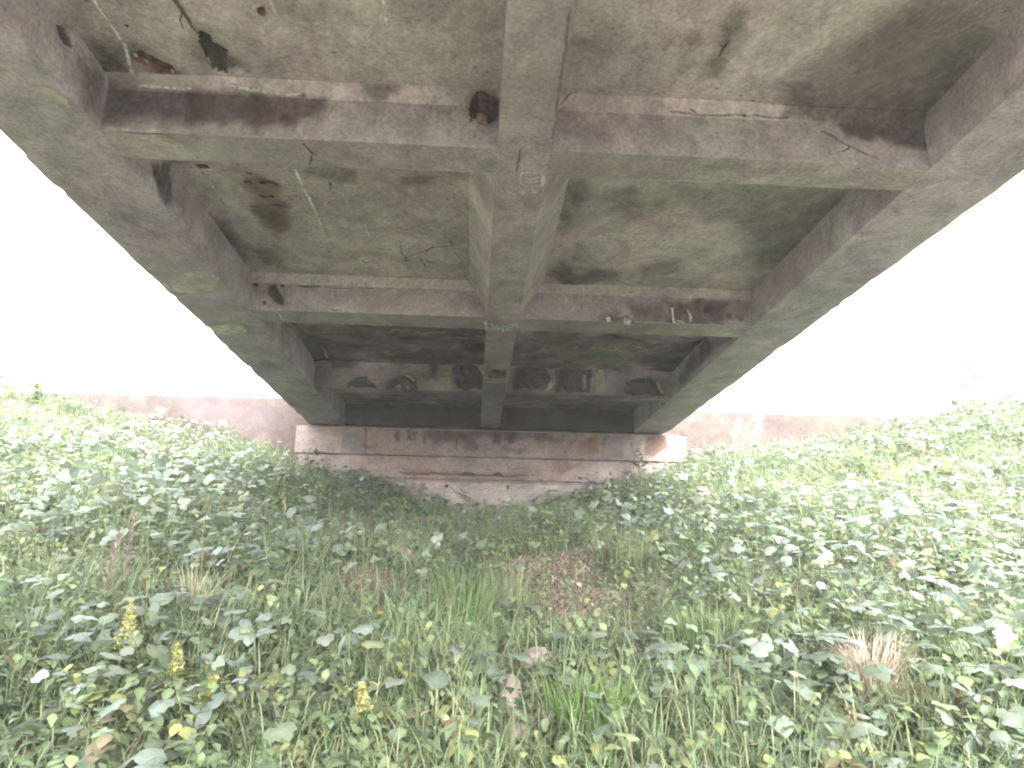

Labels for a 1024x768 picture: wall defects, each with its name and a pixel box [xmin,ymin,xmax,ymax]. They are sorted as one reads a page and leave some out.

spalling [51,14,79,57]
crack [172,0,198,33]
spalling [187,23,241,77]
water stain [96,47,322,123]
crack [551,8,572,139]
water stain [788,1,967,148]
spalling [461,89,498,130]
crack [674,108,789,119]
crack [821,130,880,160]
spalling [446,364,510,391]
spalling [620,374,668,396]